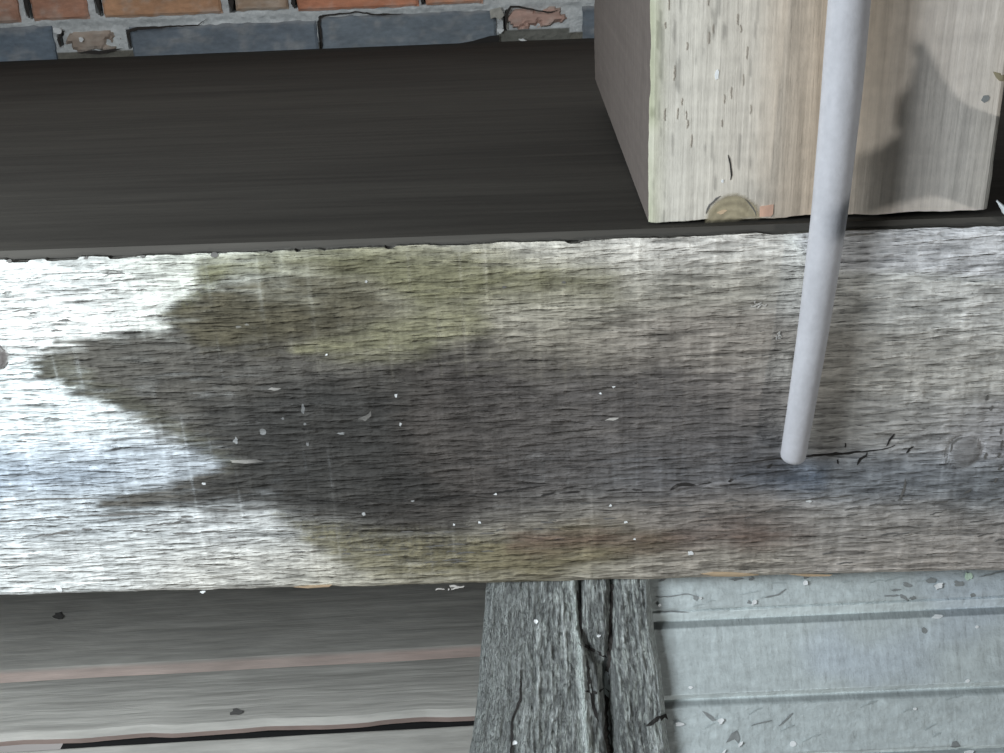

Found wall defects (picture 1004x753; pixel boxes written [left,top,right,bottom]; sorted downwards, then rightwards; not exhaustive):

leakage [31,277,770,530]
peeling [658,593,702,613]
peeling [885,582,916,601]
peeling [925,577,976,597]
crack [577,584,614,753]
peeling [722,730,743,753]